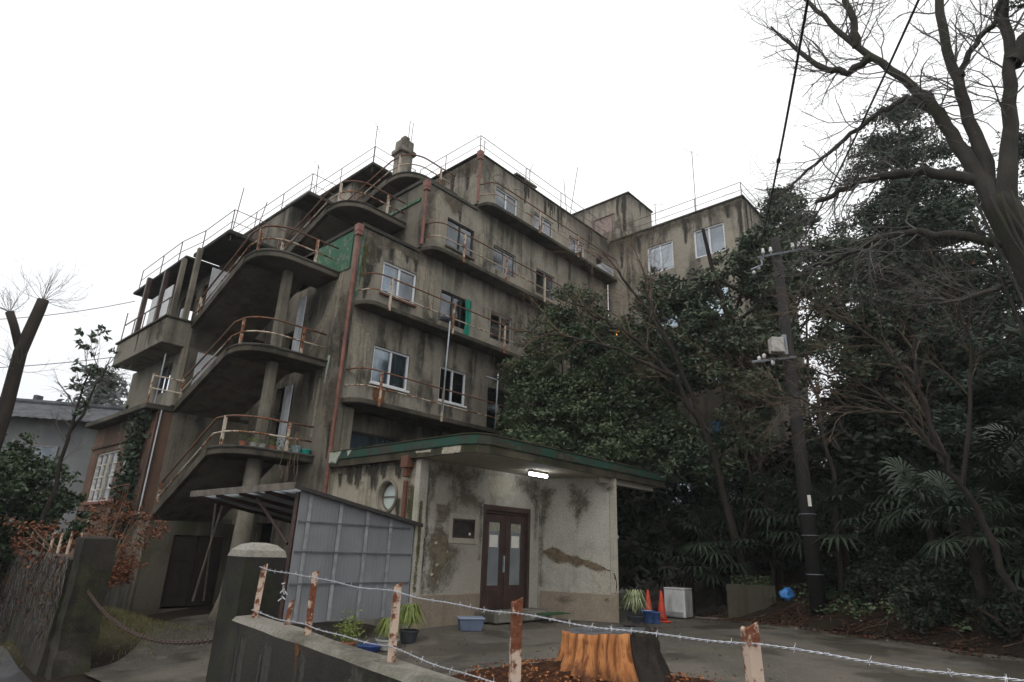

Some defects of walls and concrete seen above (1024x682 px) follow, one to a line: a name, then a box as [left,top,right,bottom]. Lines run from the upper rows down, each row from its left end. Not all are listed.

leakage [544,199,569,233]
leakage [611,195,752,269]
leakage [329,462,402,507]
peeling [543,547,606,572]